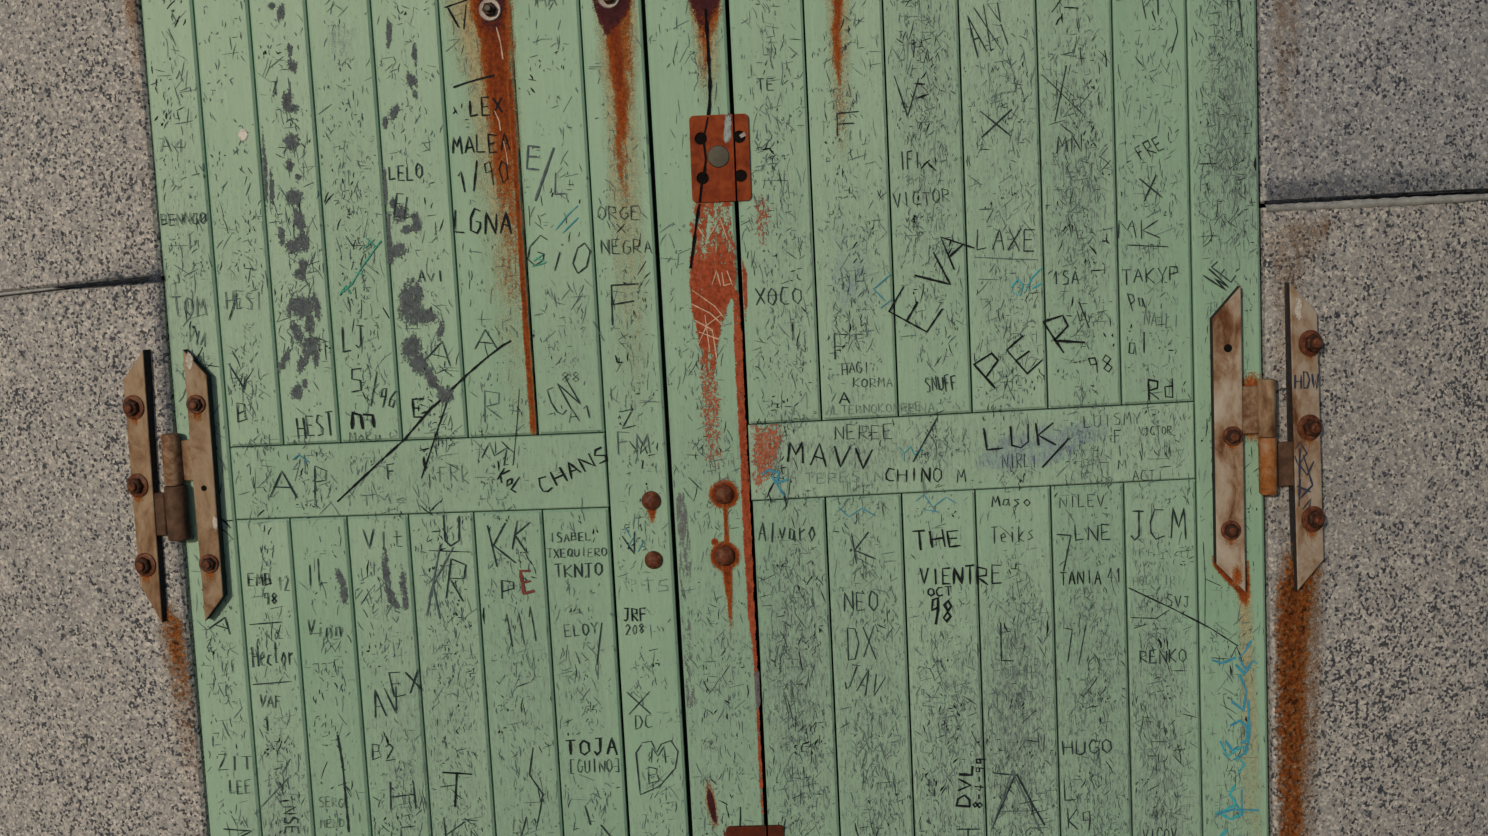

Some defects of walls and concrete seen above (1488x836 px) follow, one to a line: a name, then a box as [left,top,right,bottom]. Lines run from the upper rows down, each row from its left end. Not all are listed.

rust [450,0,536,435]
rust [592,0,639,269]
rust [688,0,722,81]
rust [827,0,849,130]
rust [1242,372,1258,386]
rust [709,480,740,626]
rust [1212,555,1258,828]
rust [1272,551,1322,836]